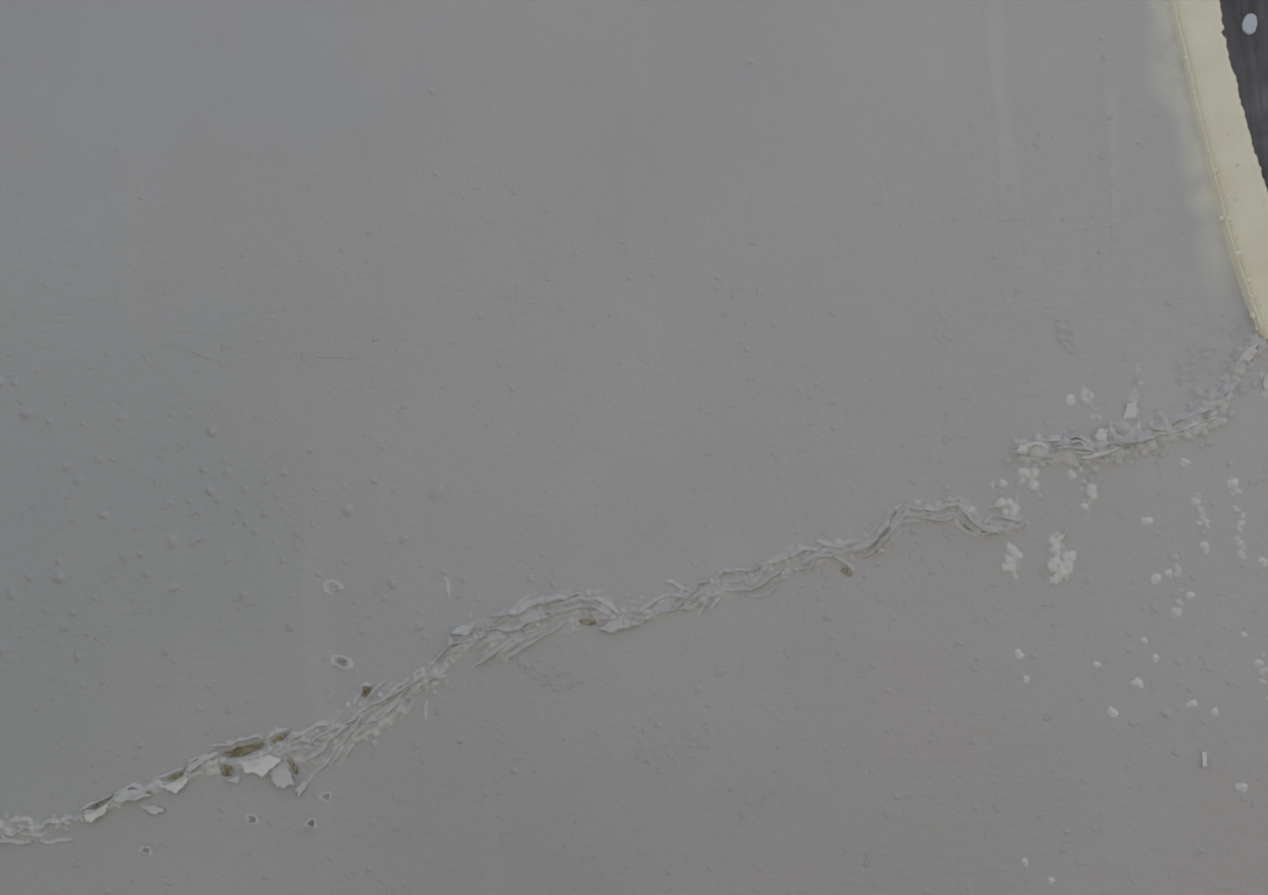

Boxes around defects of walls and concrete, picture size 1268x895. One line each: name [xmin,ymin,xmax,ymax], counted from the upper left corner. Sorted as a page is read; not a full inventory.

crack [0,331,1268,845]